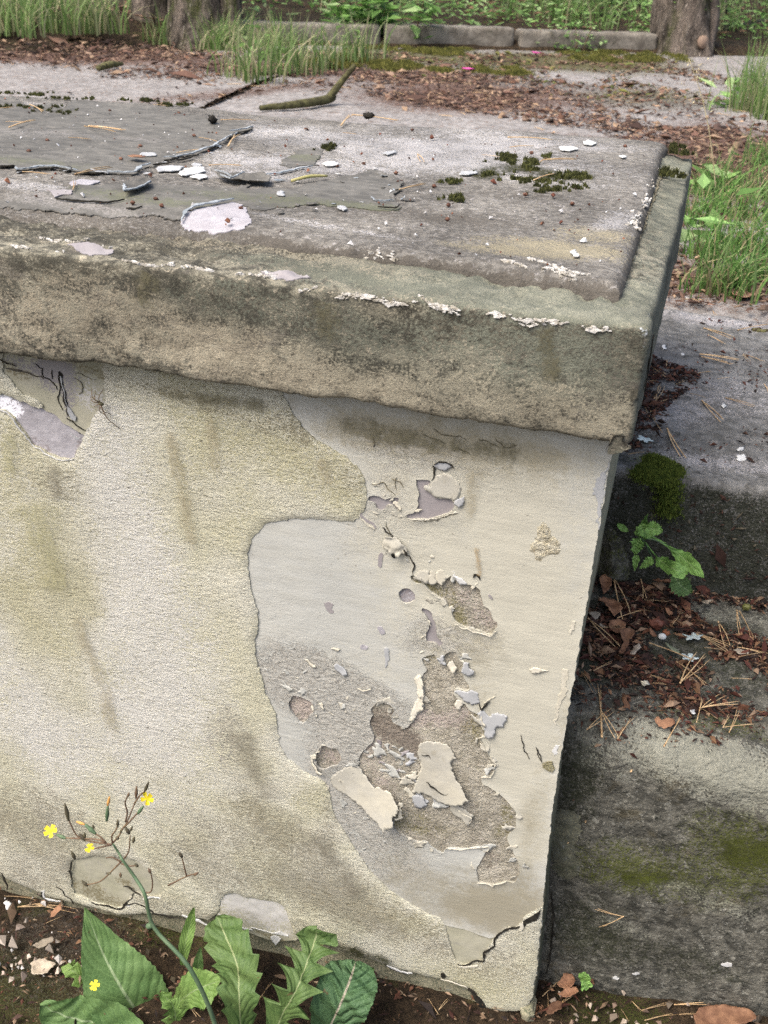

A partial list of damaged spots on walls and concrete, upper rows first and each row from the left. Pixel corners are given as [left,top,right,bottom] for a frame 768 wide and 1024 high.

peeling [0,97,415,235]
peeling [363,247,398,262]
peeling [335,292,461,315]
peeling [486,310,569,328]
peeling [500,257,591,281]
peeling [582,325,612,334]
crack [0,360,95,431]
peeling [0,353,105,461]
peeling [248,392,631,963]
peeling [68,856,207,925]
peeling [217,893,297,945]
crack [440,893,556,1008]